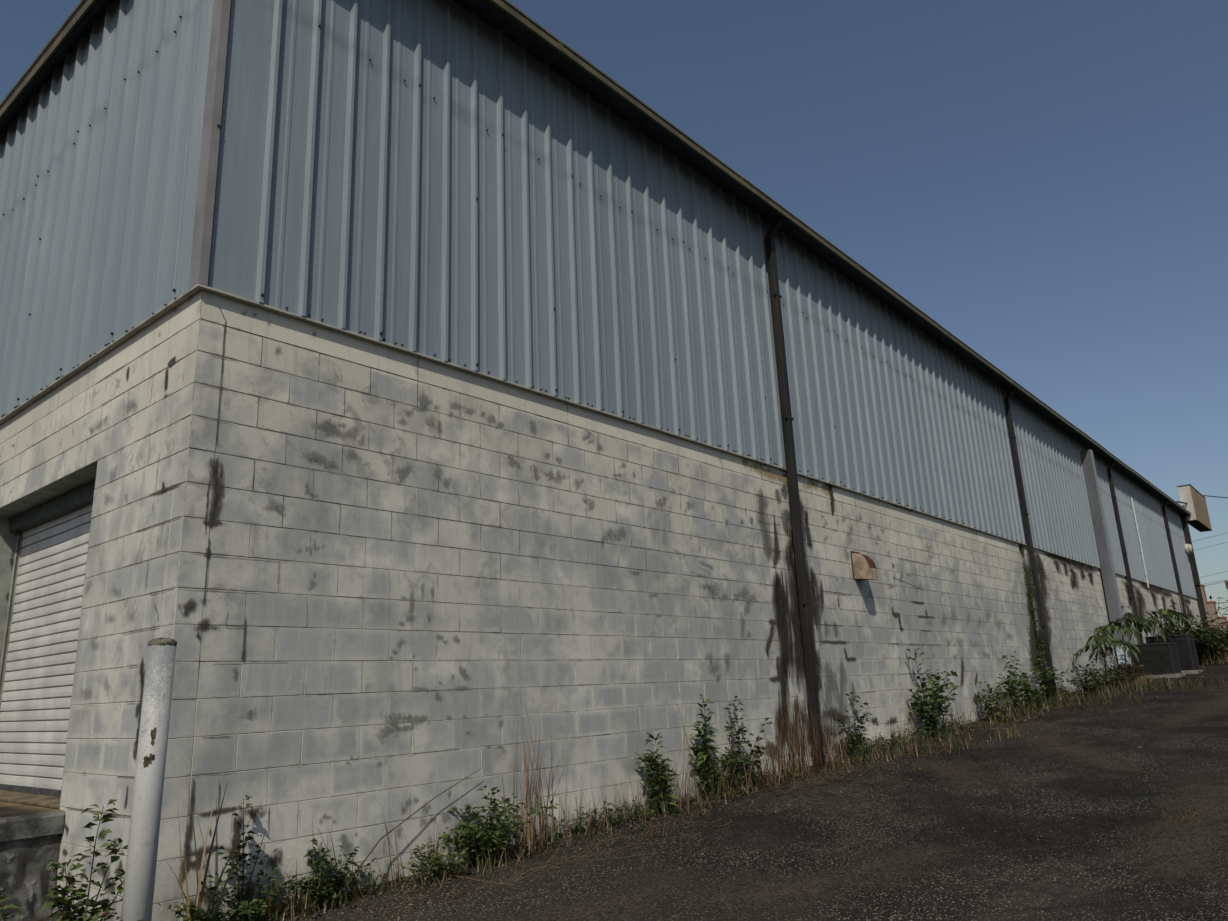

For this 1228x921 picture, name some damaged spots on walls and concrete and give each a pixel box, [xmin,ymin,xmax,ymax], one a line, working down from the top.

water stain [203,459,224,533]
water stain [759,483,858,756]
water stain [1019,544,1102,694]
water stain [133,659,144,759]
water stain [0,849,67,915]
water stain [81,830,124,916]